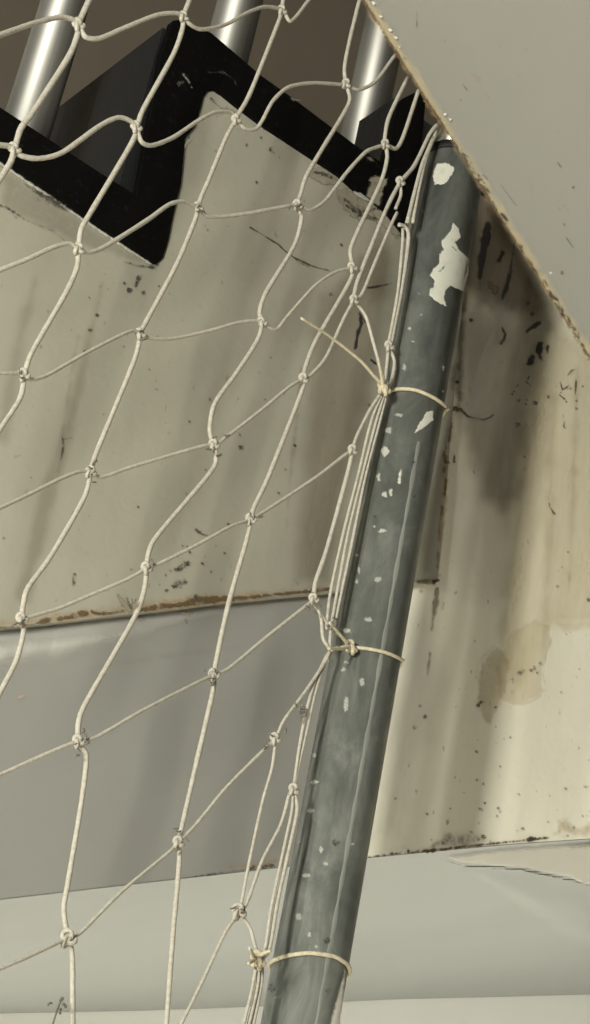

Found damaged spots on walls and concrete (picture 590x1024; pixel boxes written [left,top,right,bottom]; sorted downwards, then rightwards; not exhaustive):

water stain [461,153,534,309]
crack [249,227,329,271]
crack [453,407,494,420]
corrosion [141,587,330,611]
corrosion [0,610,123,628]